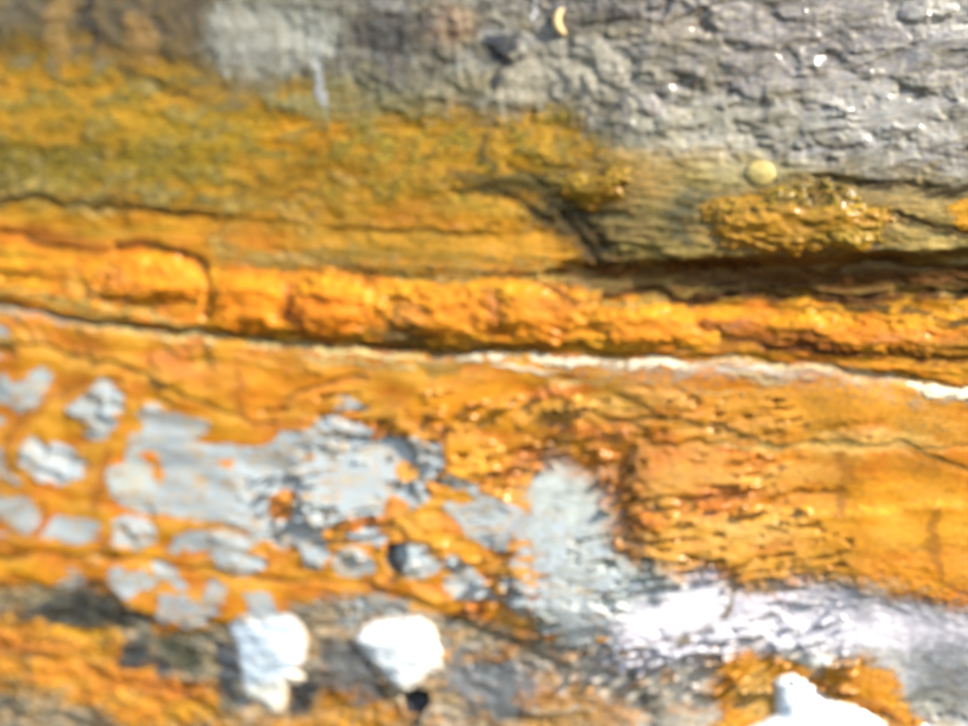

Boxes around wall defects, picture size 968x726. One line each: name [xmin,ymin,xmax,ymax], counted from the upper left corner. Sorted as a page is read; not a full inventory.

water stain [919,0,968,39]
water stain [480,32,689,148]
water stain [449,133,620,266]
crack [832,177,968,196]
peeling [0,366,53,414]
crack [0,239,583,359]
crack [318,209,968,366]
corrosion [423,284,968,388]
peeling [0,376,664,649]
corrosion [0,310,968,638]
spalling [403,689,430,713]
corrosion [706,649,924,726]